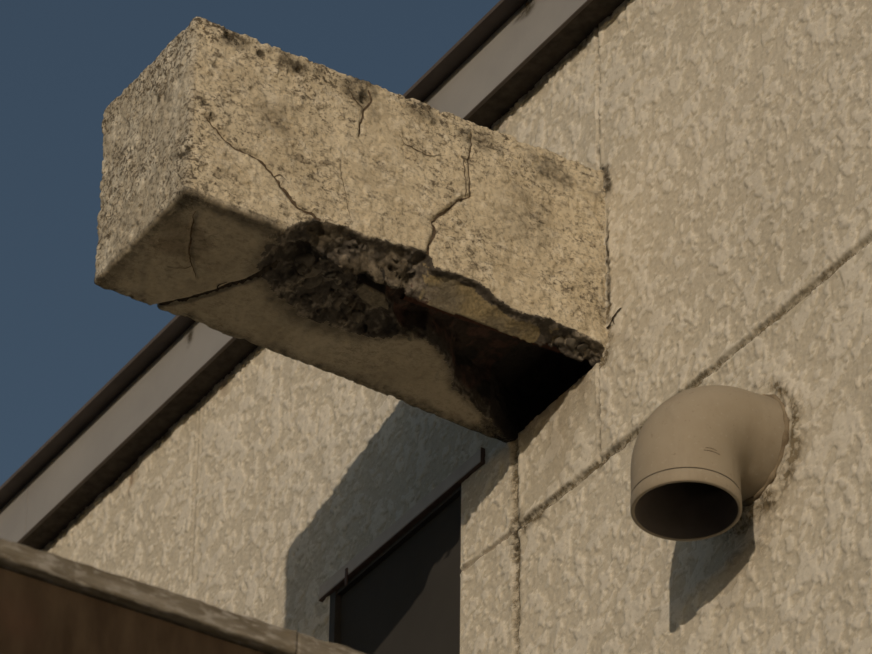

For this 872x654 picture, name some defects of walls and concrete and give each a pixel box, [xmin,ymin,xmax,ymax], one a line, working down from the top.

crack [348,86,372,134]
crack [206,117,321,221]
crack [400,134,472,255]
crack [159,211,280,305]
spalling [256,218,605,441]